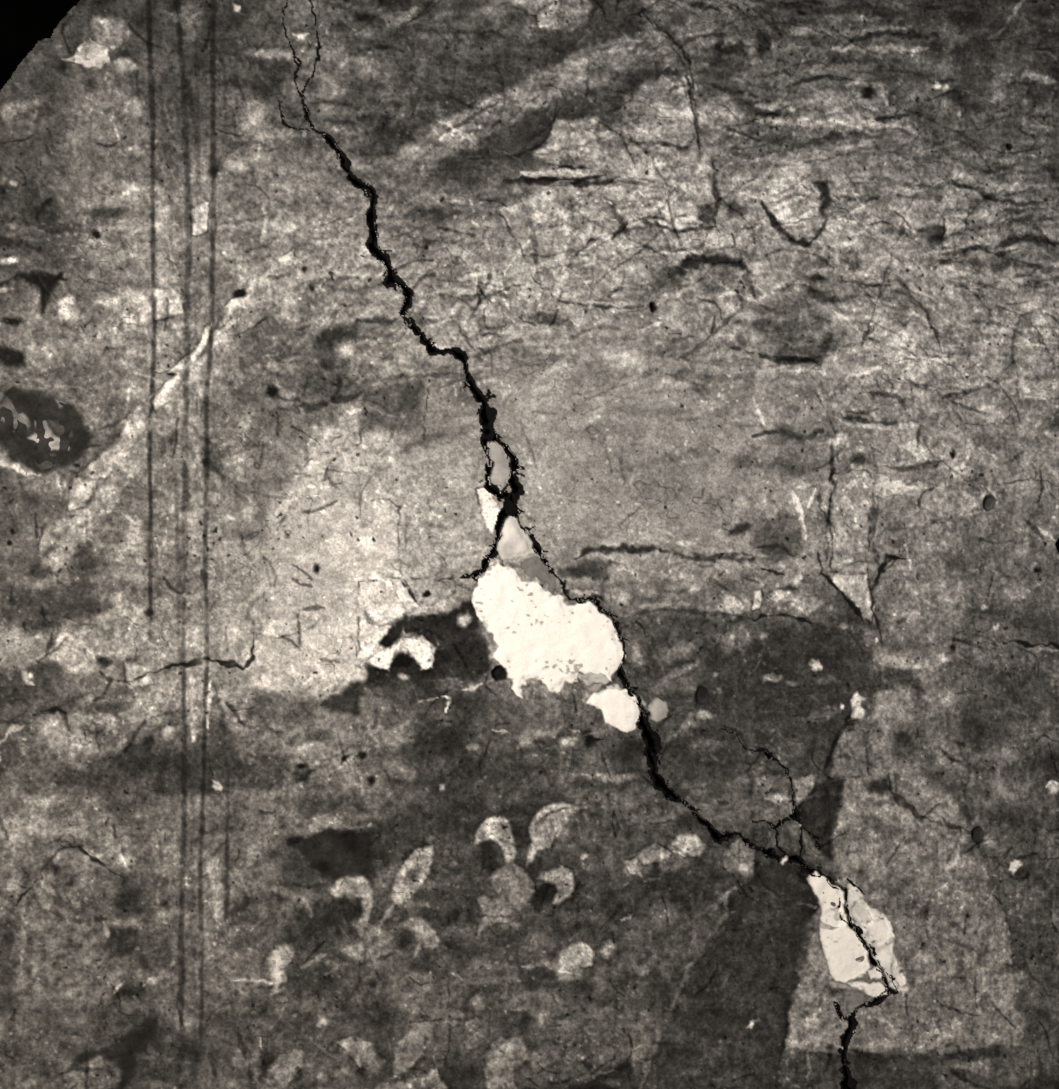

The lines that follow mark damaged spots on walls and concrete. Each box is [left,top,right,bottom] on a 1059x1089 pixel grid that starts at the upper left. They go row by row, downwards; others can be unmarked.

crack [278,0,899,1089]